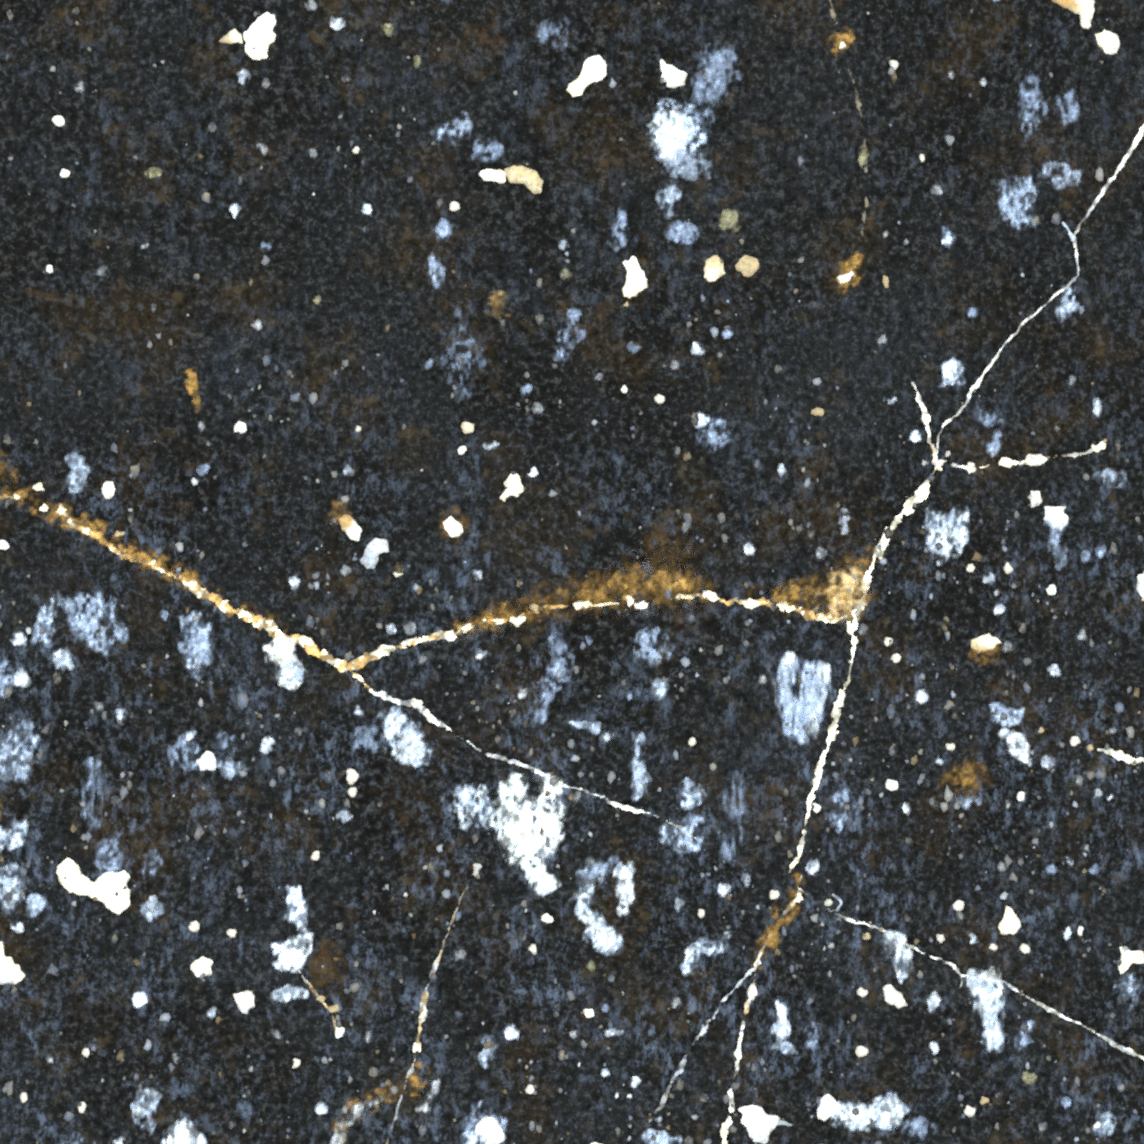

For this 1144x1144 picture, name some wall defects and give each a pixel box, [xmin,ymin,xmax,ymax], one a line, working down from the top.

crack [828,0,837,24]
crack [848,69,869,236]
crack [0,124,1144,915]
corrosion [767,548,871,621]
crack [298,970,345,1038]
crack [386,863,482,1144]
crack [647,935,770,1144]
crack [823,894,1144,1060]